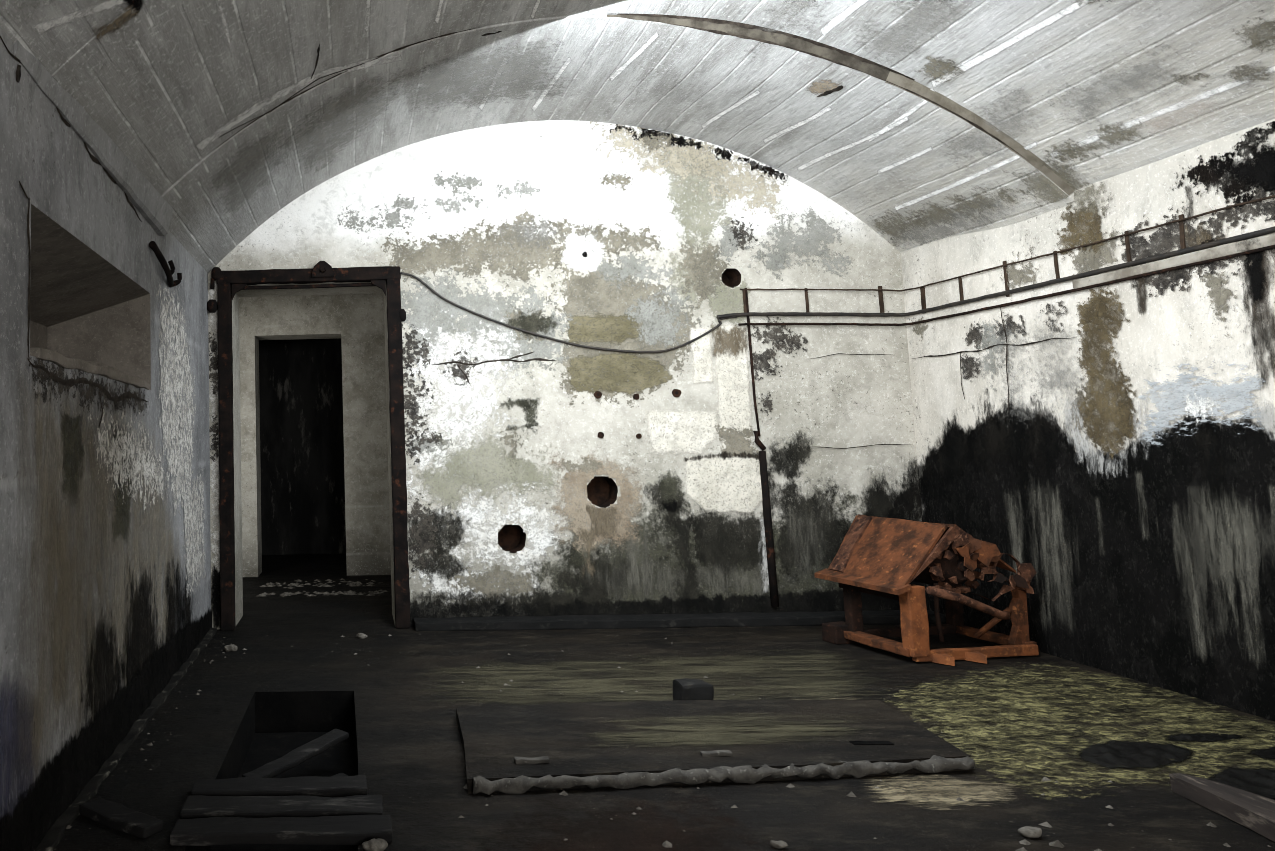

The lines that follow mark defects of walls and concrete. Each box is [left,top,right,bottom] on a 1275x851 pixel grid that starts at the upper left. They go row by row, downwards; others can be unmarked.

leakage [707,281,750,357]
leakage [1070,121,1275,386]
leakage [407,330,1275,721]